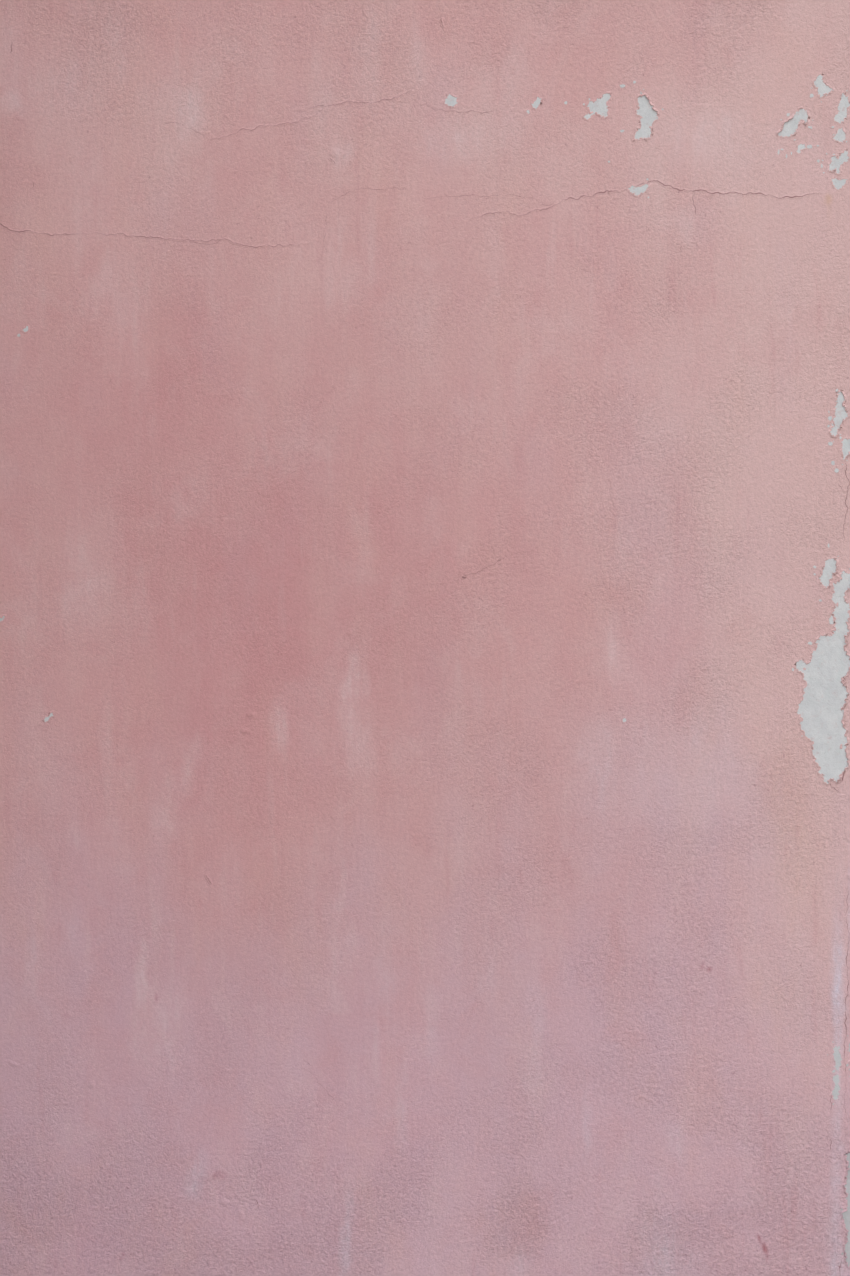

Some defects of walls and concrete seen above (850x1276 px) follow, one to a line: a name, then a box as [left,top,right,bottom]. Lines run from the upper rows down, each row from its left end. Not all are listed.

peeling [582,81,664,142]
peeling [775,72,850,192]
crack [0,179,827,249]
peeling [827,389,850,473]
peeling [792,544,850,786]